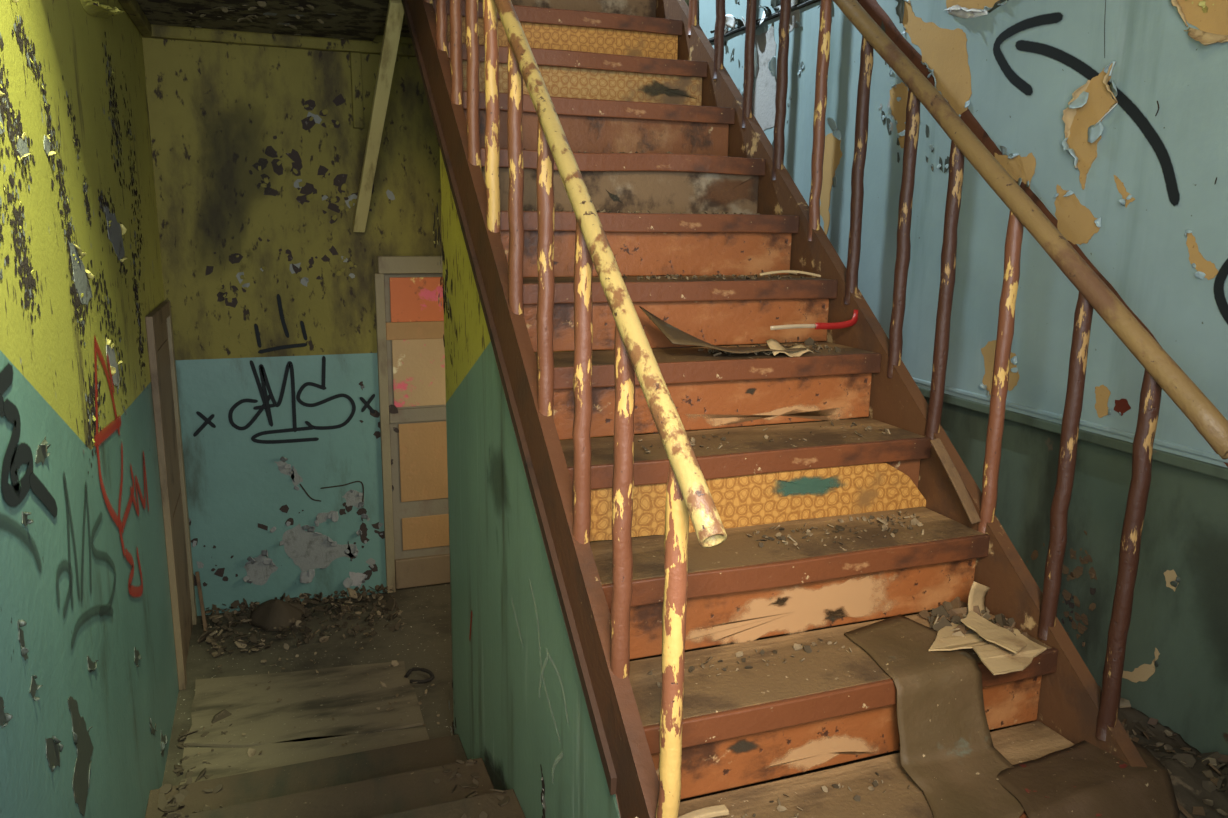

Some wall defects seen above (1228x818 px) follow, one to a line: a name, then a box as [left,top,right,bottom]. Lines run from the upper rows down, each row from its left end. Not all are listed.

peeling [1171,0,1228,45]
peeling [896,0,1008,116]
peeling [1054,61,1118,245]
peeling [1114,175,1135,207]
peeling [0,0,146,474]
peeling [1185,230,1219,280]
peeling [359,405,399,439]
peeling [189,489,385,589]
peeling [17,619,29,661]
peeling [0,697,13,728]
peeling [29,675,43,701]
peeling [45,696,94,816]